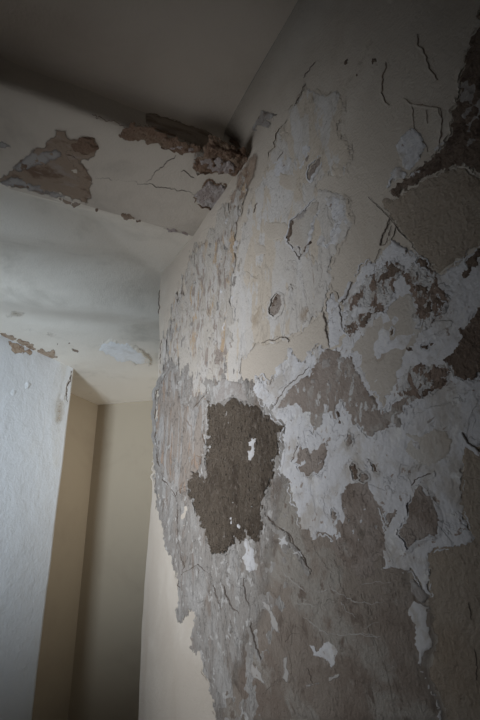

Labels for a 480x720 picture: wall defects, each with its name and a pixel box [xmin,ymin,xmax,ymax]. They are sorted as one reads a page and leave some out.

crack [379,62,443,154]
crack [104,155,194,195]
spalling [99,7,480,720]
crack [260,513,311,576]